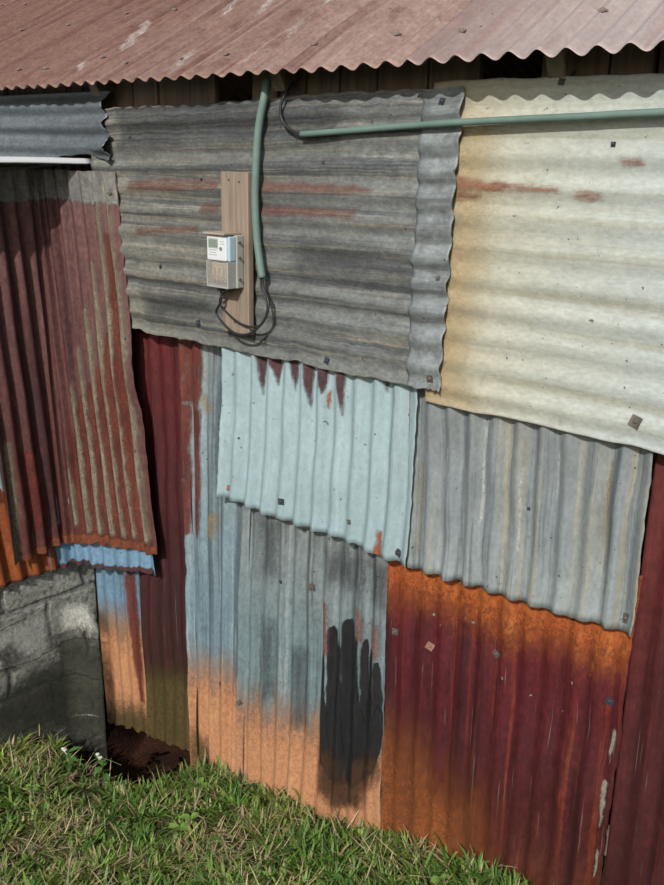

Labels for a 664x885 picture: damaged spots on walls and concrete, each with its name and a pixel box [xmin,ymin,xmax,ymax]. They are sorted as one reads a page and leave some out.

rust [0,233,157,703]
rust [178,340,212,536]
rust [256,356,345,414]
rust [374,532,641,666]
leakage [0,605,209,770]
rust [380,724,482,864]
peeling [599,780,607,827]